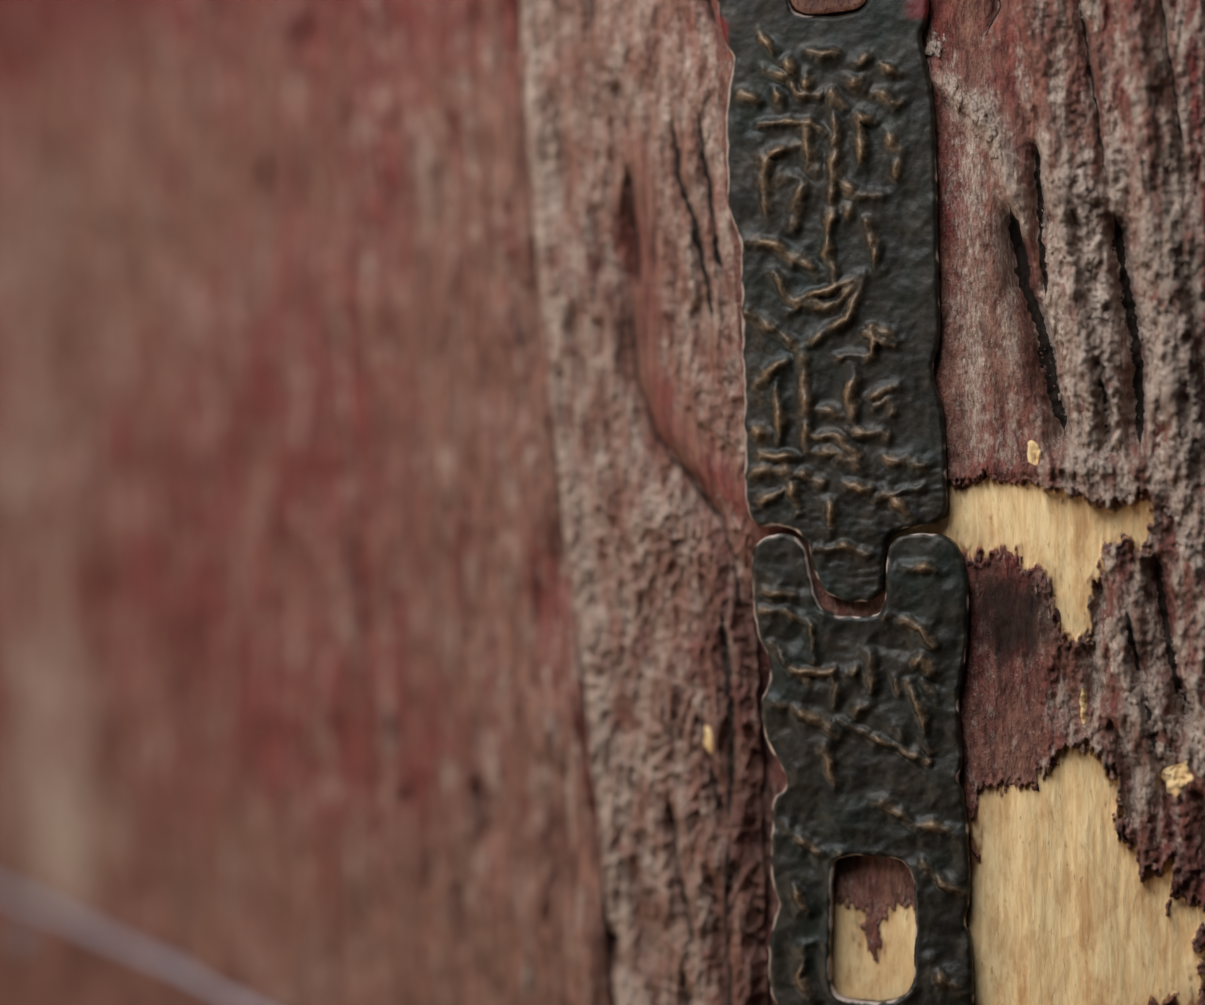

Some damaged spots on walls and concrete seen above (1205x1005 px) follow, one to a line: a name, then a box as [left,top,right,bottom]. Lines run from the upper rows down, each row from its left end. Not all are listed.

crack [984,0,1001,39]
crack [1008,146,1067,436]
crack [1079,0,1145,449]
peeling [886,167,1205,799]
peeling [832,894,916,1001]
peeling [966,688,1205,1005]